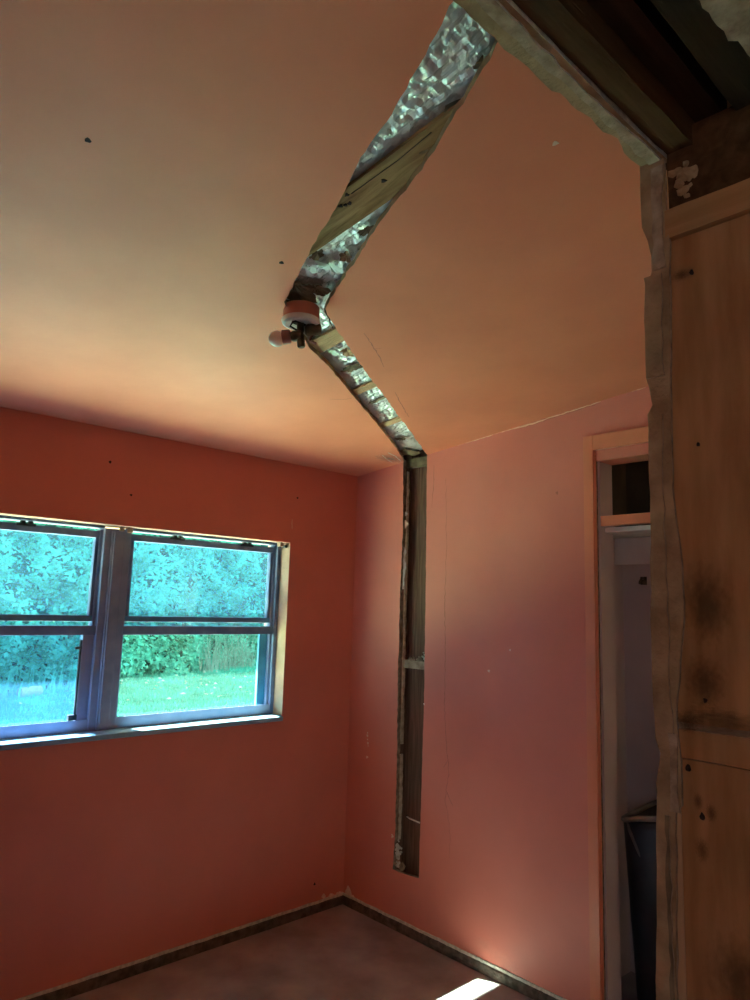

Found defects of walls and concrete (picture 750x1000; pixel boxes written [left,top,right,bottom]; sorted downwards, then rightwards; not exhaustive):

spalling [453,0,685,1000]